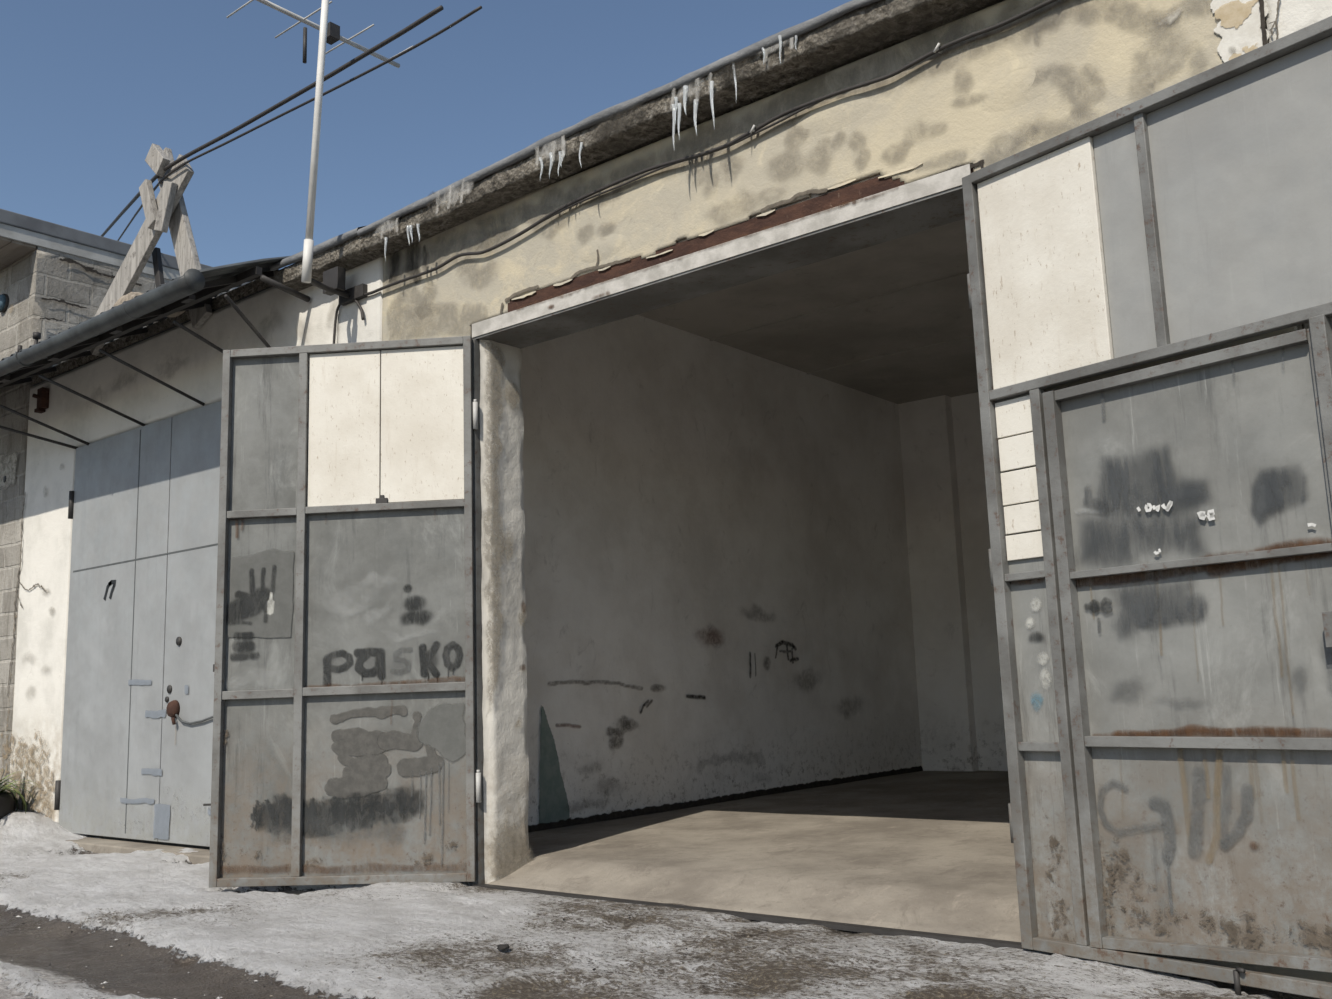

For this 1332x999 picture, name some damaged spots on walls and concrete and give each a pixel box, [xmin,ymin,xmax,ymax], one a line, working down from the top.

peeling [1210,0,1269,63]
corrosion [1094,725,1332,737]
water stain [0,708,55,818]